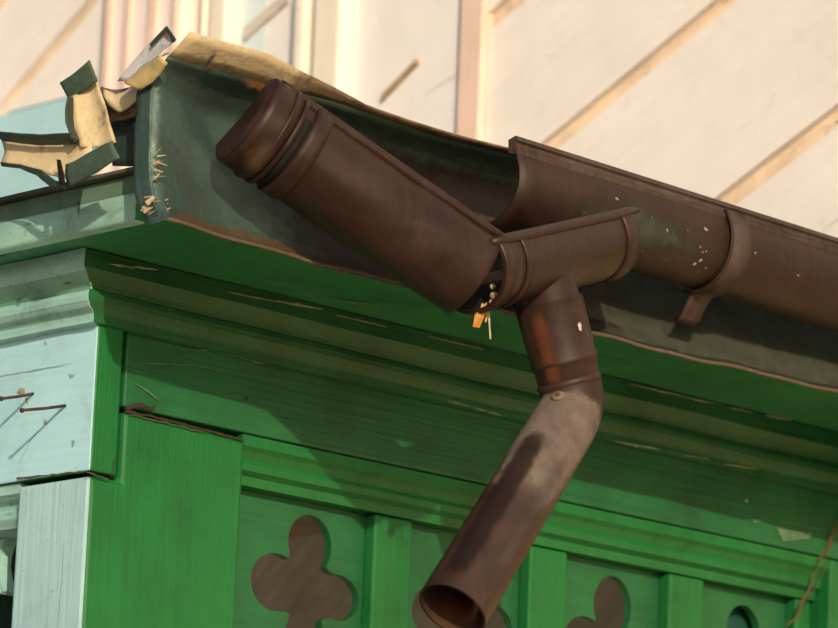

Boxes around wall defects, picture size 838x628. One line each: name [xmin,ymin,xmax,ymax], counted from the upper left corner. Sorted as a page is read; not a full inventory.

peeling [230,292,323,310]
crack [124,349,264,446]
peeling [776,528,812,542]
crack [786,522,838,627]